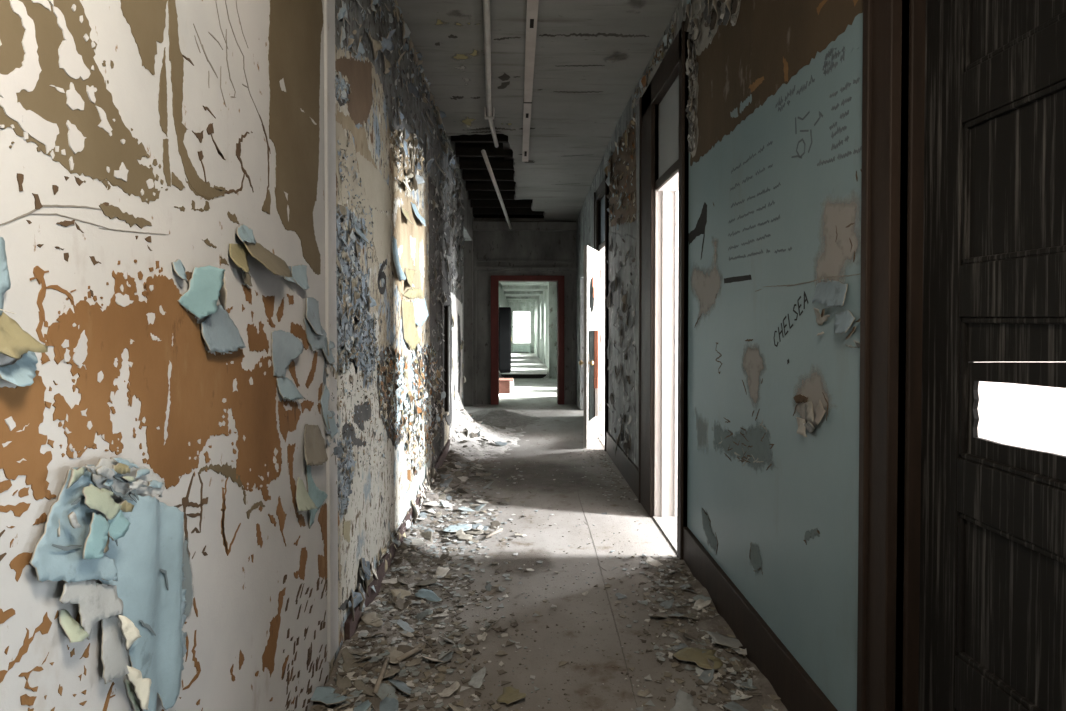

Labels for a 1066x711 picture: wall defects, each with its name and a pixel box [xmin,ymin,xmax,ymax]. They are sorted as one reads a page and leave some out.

peeling [0,0,513,711]
peeling [605,232,637,459]
spalling [793,371,829,437]